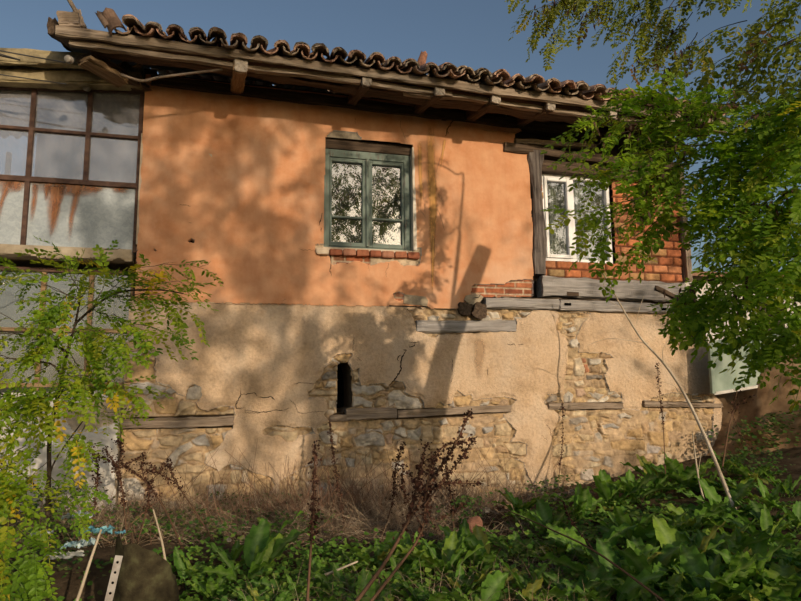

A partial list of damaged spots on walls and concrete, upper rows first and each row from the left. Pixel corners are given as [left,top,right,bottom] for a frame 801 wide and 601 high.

rust [0,181,22,209]
rust [32,183,102,226]
spalling [315,147,422,266]
water stain [418,140,446,285]
spalling [471,279,534,298]
spalling [407,302,532,329]
crack [391,342,417,383]
crack [235,382,324,414]
spalling [65,330,537,511]
spalling [543,311,715,487]